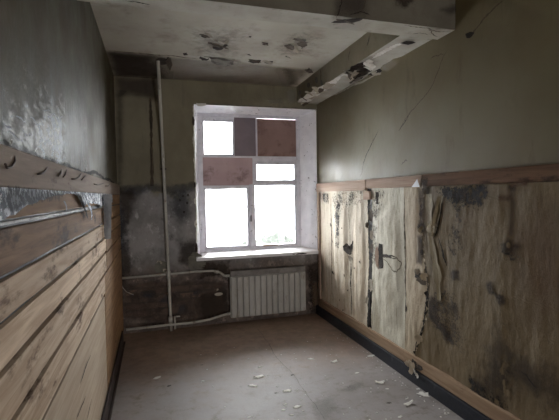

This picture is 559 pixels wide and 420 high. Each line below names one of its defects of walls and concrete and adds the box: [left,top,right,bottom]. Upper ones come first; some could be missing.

spalling [124,38,415,321]
leakage [437,184,489,258]
leakage [322,189,385,328]
leakage [428,288,463,353]
peeling [404,359,423,378]
leakage [468,346,510,410]